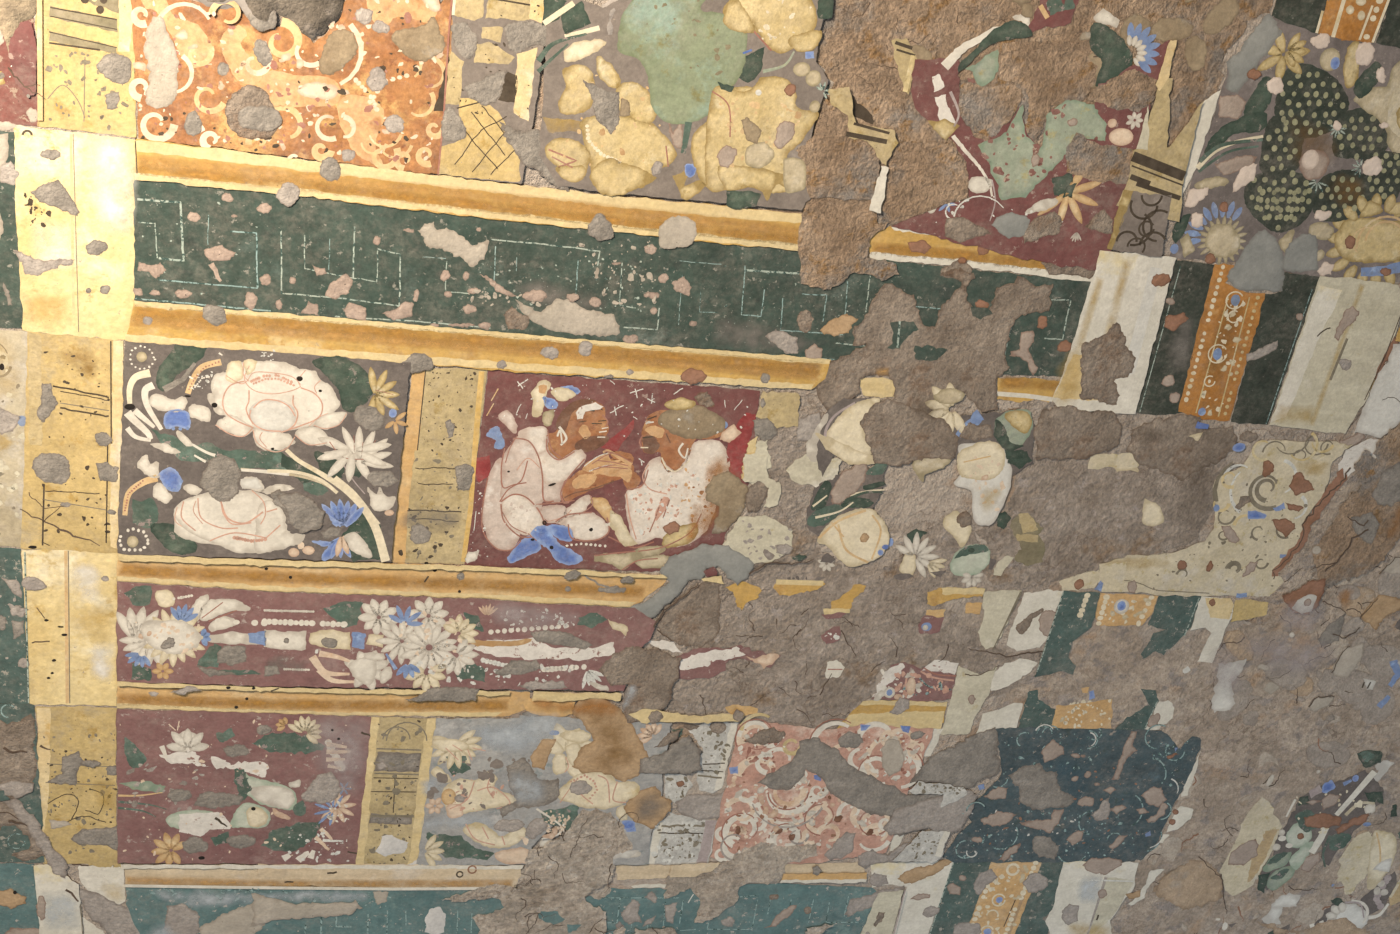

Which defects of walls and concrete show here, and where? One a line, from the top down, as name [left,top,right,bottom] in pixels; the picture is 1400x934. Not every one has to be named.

spalling [202,304,227,326]
spalling [402,0,1400,934]
spalling [161,637,175,649]
spalling [149,645,247,696]
spalling [234,665,280,709]
spalling [0,714,118,878]
spalling [301,772,341,804]
spalling [167,788,256,849]
spalling [375,835,417,865]
spalling [0,888,27,909]
spalling [79,889,140,934]
spalling [157,891,389,934]